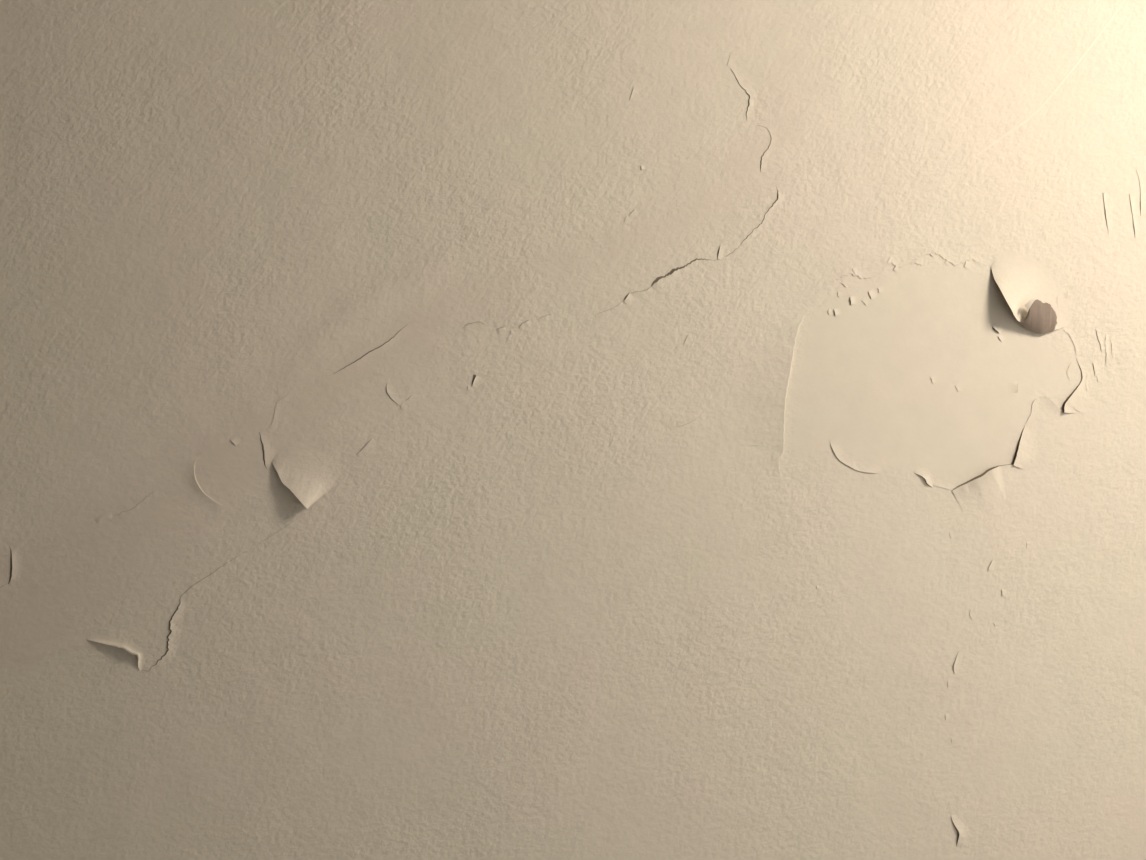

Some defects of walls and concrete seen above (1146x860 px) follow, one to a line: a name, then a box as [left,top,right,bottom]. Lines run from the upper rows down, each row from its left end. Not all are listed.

crack [596,54,786,322]
peeling [259,324,414,509]
peeling [467,374,482,391]
peeling [714,244,1098,520]